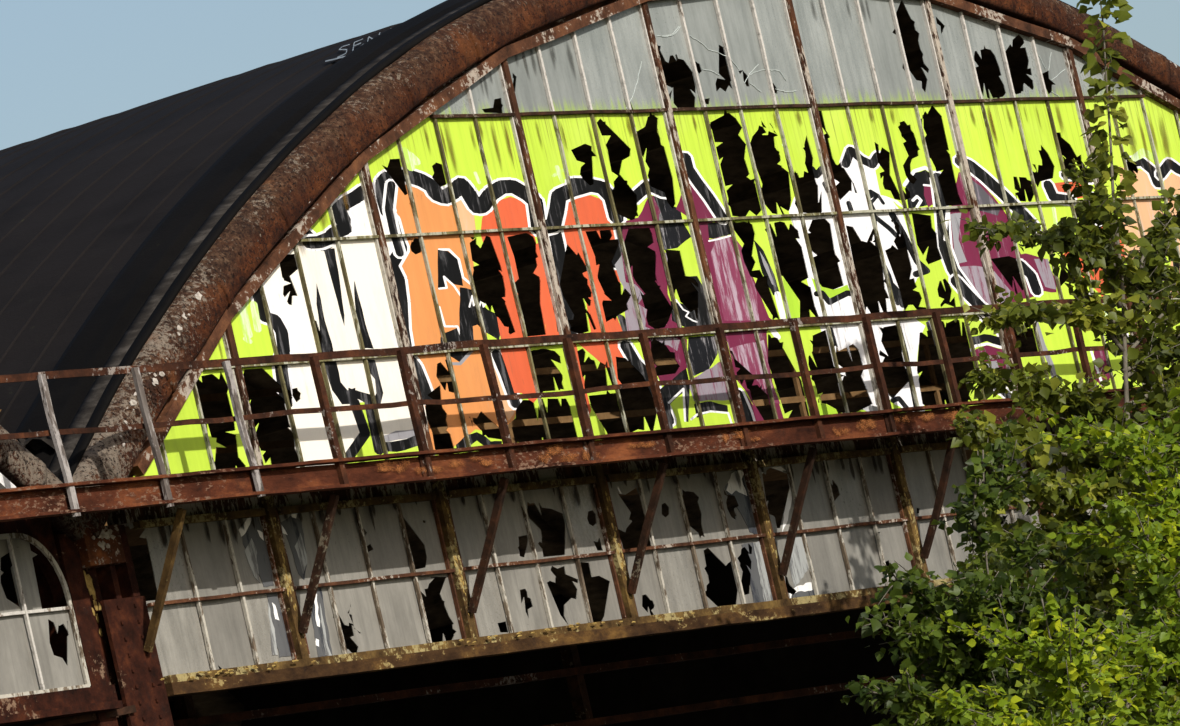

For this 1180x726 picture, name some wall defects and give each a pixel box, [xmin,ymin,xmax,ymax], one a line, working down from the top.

corrosion [542,444,588,461]
corrosion [380,460,460,472]